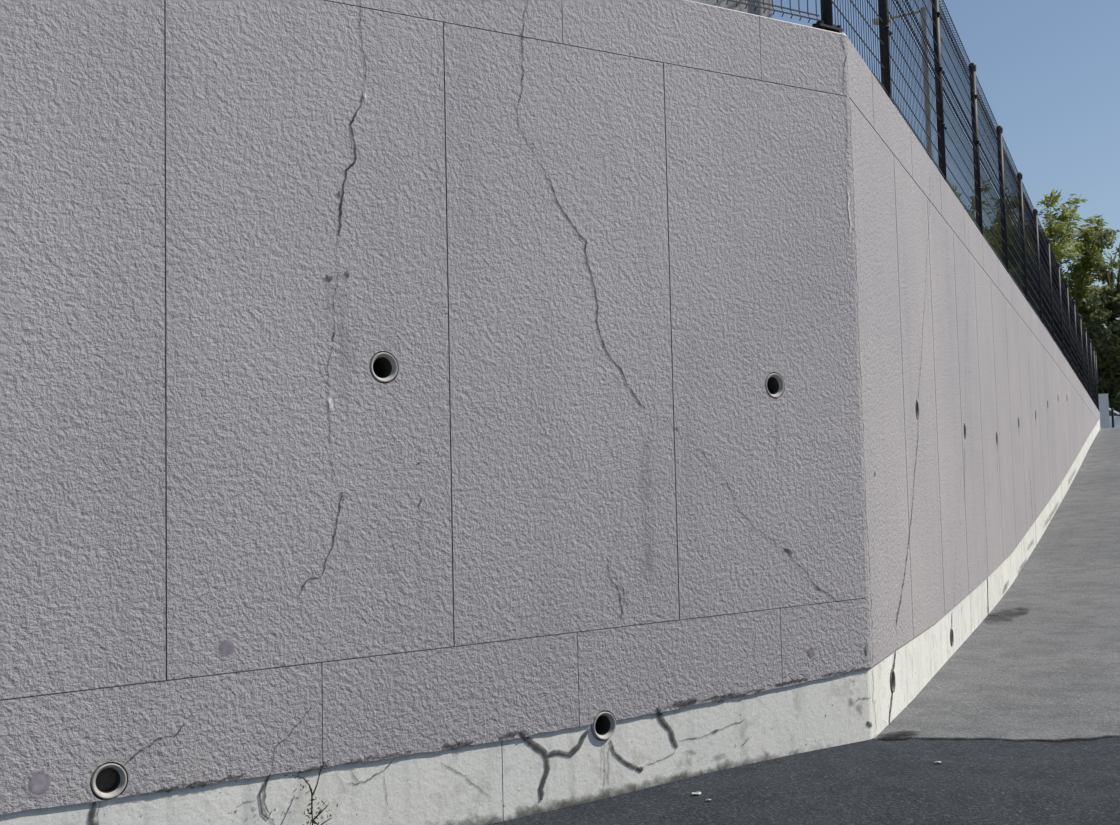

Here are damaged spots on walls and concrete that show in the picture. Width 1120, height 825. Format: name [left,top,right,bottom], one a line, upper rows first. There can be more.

crack [336,15,367,244]
crack [325,271,349,364]
crack [544,169,646,410]
crack [299,470,345,596]
crack [607,539,627,617]
crack [865,441,918,724]
crack [247,728,293,824]
crack [610,740,644,772]